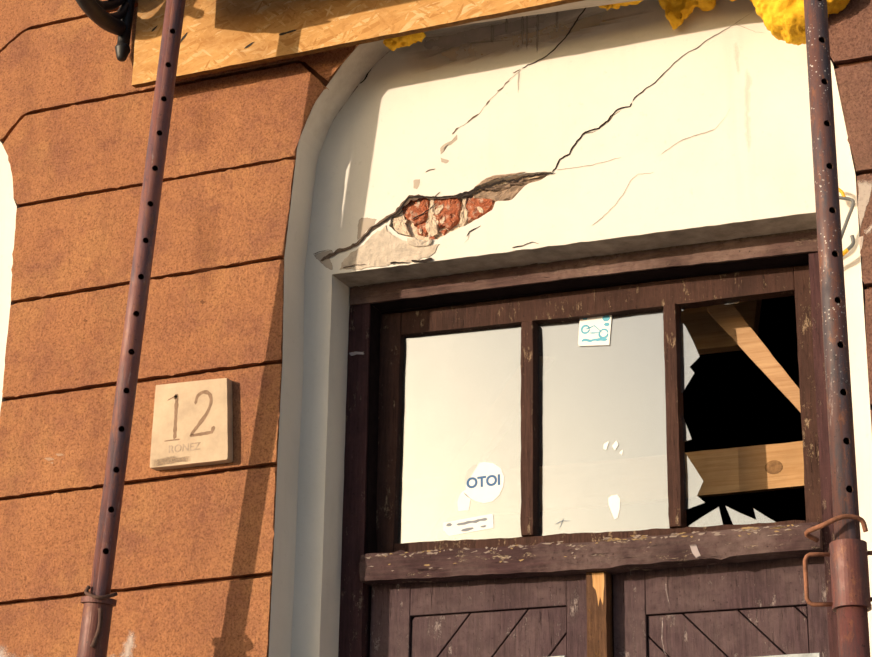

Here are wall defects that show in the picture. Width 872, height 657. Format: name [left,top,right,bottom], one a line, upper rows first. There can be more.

crack [413,8,586,196]
crack [552,13,764,172]
crack [390,257,432,265]
spalling [314,172,554,270]